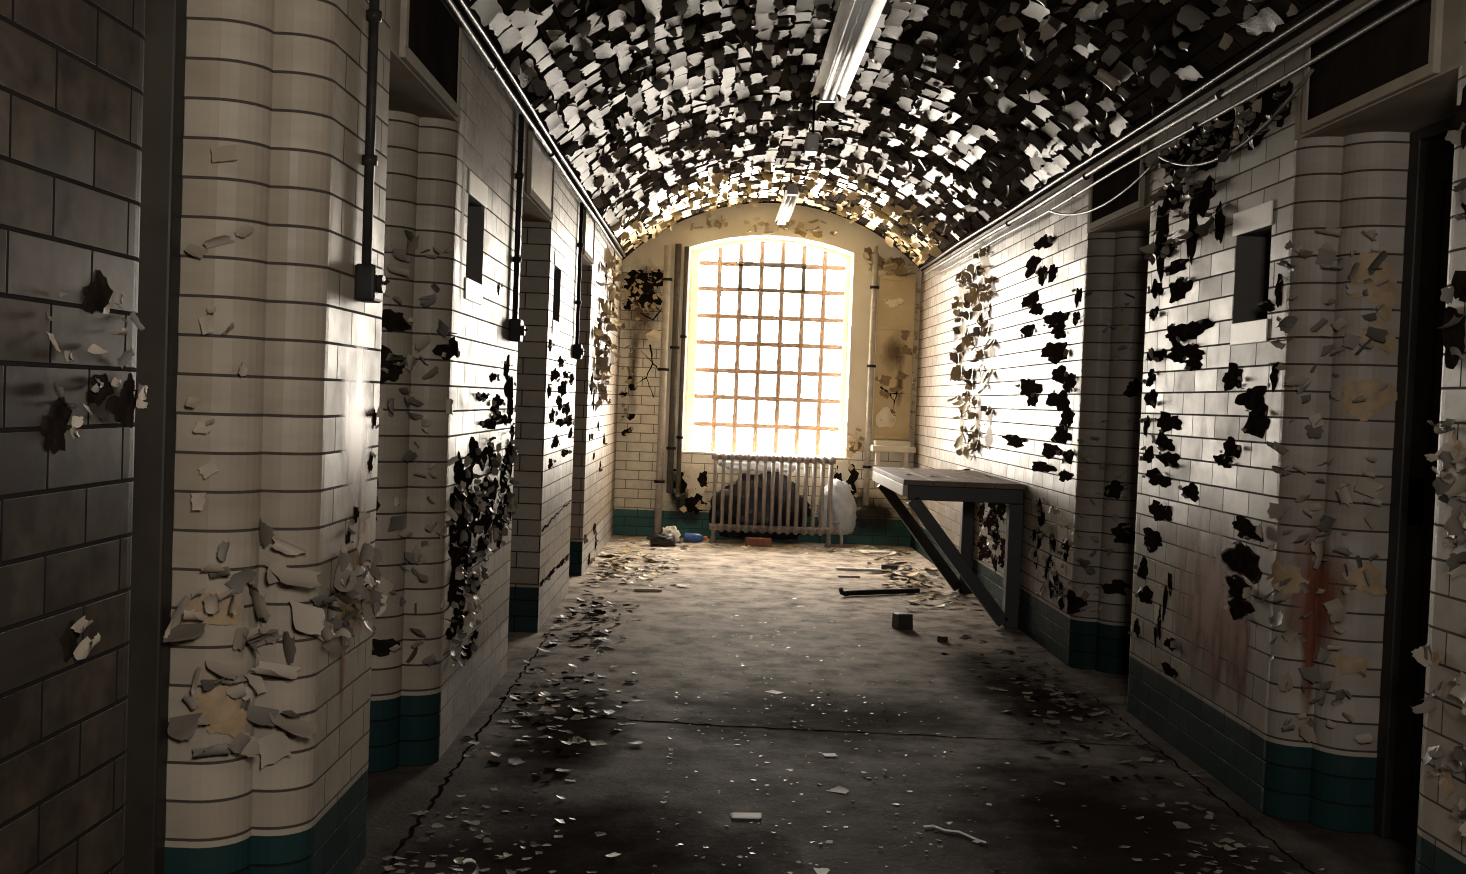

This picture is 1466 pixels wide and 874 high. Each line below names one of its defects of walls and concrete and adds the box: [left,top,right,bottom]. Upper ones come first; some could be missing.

peeling [1445,85,1466,149]
peeling [1452,179,1466,221]
peeling [40,270,148,454]
peeling [470,0,1298,679]
peeling [1438,271,1466,369]
peeling [162,230,519,769]
peeling [1213,227,1398,744]
peeling [1424,418,1466,578]
peeling [1410,642,1466,715]
peeling [1422,745,1466,837]